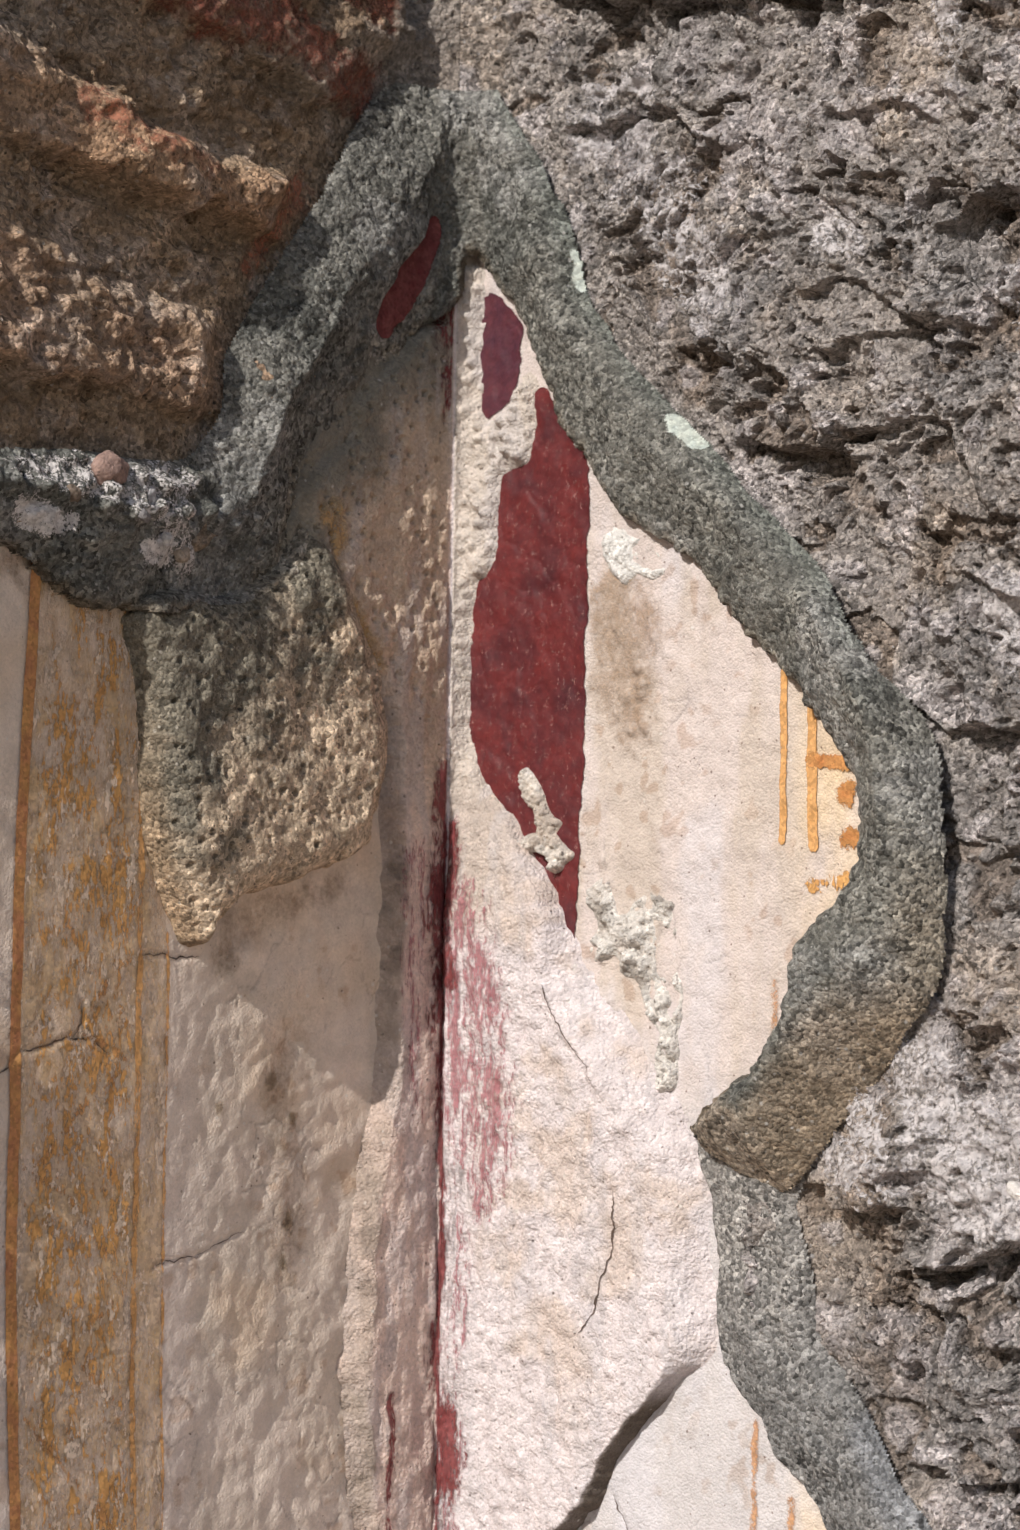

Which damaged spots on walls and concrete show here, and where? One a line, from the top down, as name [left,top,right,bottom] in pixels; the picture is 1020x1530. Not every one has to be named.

peeling [518,767,575,874]
crack [0,1005,106,1073]
crack [143,952,197,960]
crack [542,986,591,1083]
spalling [585,878,683,1093]
crack [577,1191,615,1335]